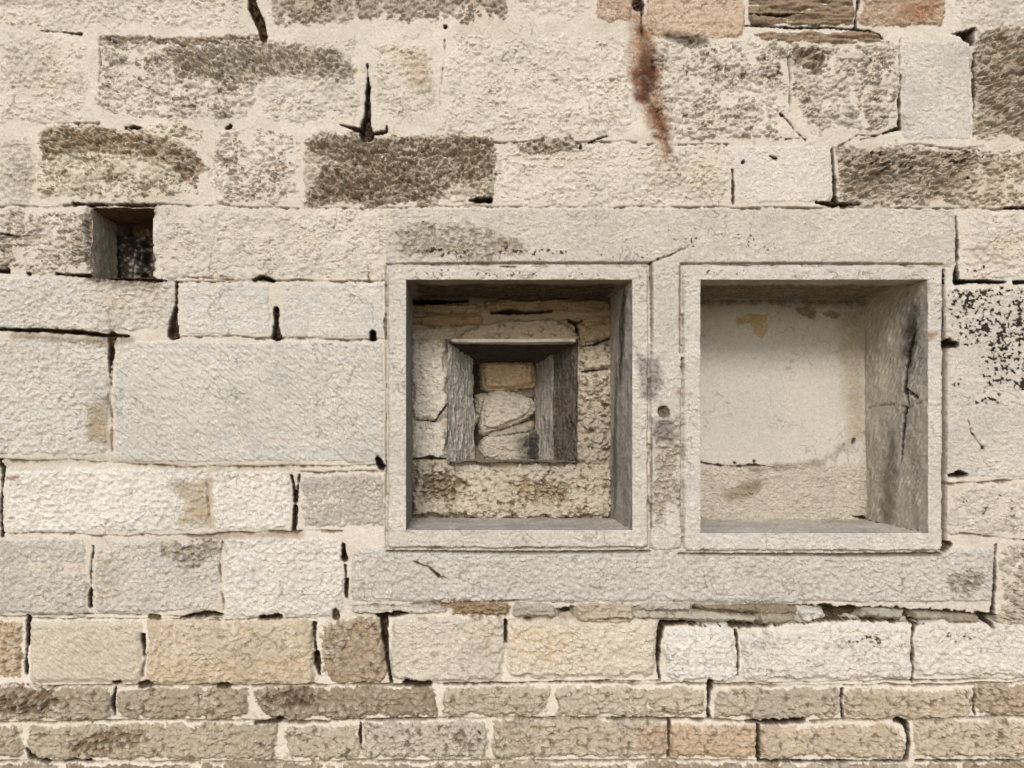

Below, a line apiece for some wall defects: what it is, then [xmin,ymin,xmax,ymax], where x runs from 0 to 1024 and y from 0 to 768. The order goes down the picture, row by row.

corrosion [629,14,670,157]
crack [900,340,919,462]